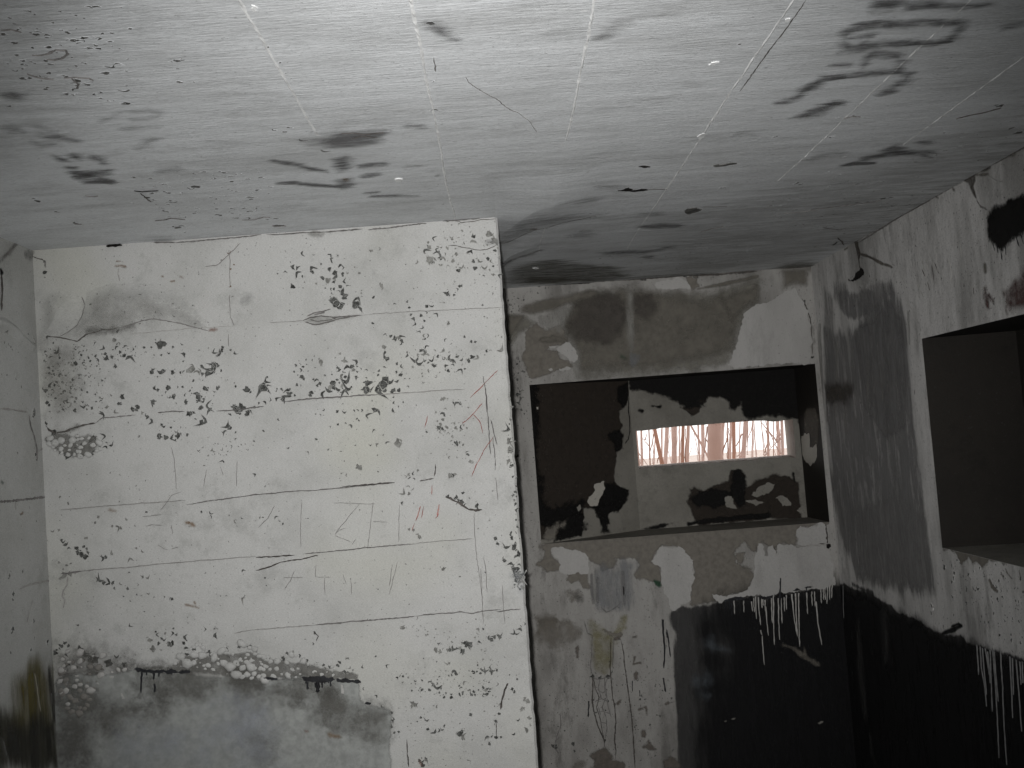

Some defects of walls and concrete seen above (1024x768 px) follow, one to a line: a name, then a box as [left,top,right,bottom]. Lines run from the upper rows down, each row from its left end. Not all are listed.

crack [466,78,537,132]
spalling [130,169,287,233]
crack [50,298,226,342]
peeling [27,221,836,611]